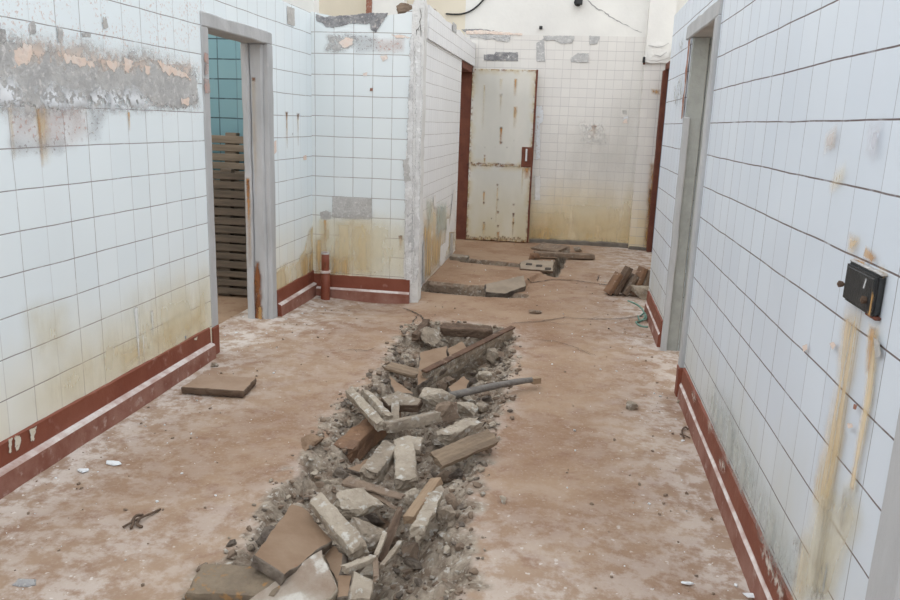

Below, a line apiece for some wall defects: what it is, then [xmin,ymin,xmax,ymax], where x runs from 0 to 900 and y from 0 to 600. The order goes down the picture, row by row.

peeling [536,36,574,62]
peeling [571,36,600,63]
spalling [0,21,210,150]
spalling [316,0,428,285]
rust [254,263,262,319]
peeling [9,426,37,453]